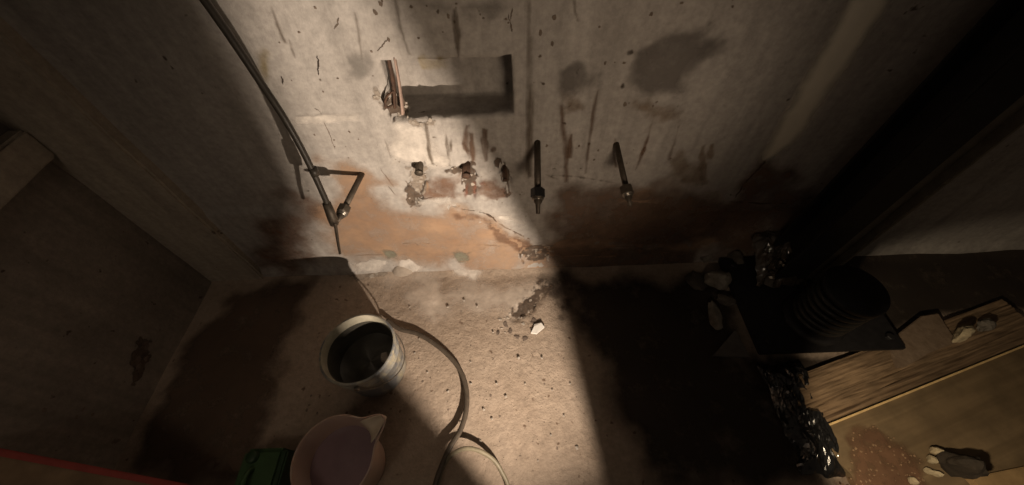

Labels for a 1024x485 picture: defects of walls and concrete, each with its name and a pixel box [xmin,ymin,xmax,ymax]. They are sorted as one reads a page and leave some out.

leakage [561,64,584,108]
leakage [621,34,714,109]
spalling [395,158,521,207]
corrosion [255,164,759,271]
leakage [357,251,531,314]
spalling [486,281,554,342]